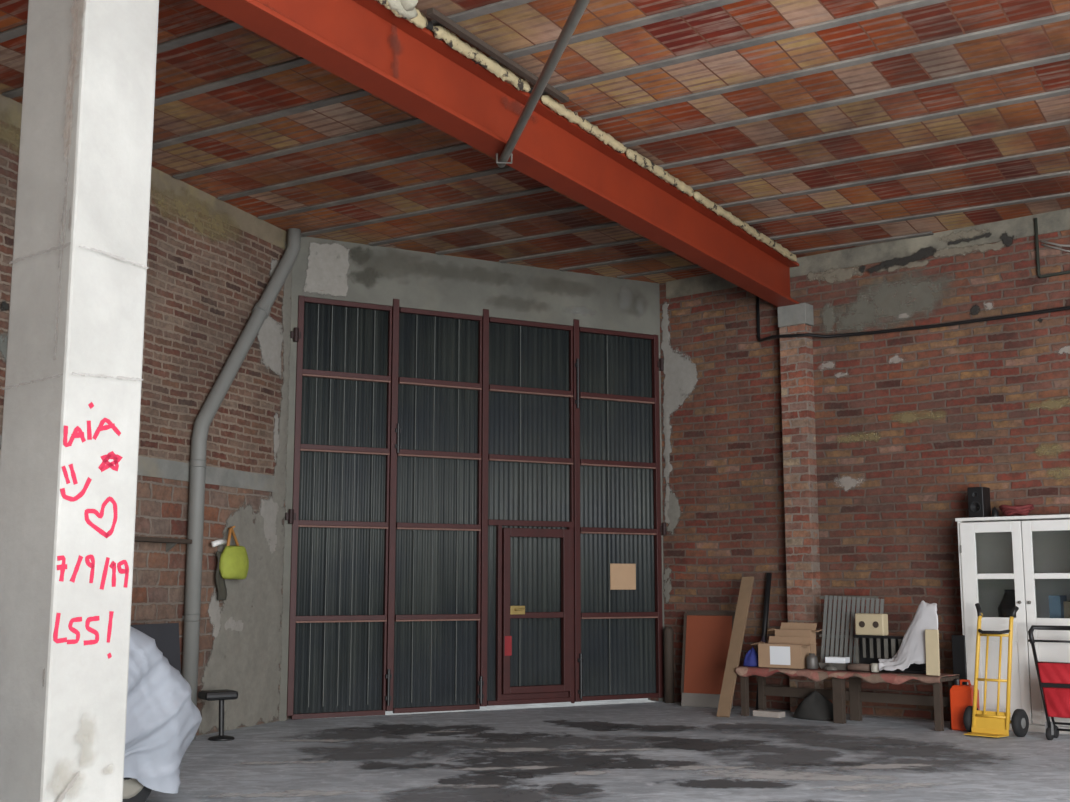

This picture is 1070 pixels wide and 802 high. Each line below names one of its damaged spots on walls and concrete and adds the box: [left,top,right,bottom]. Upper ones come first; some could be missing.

spalling [823,229,1014,284]
peeling [260,496,279,554]
peeling [208,587,244,638]